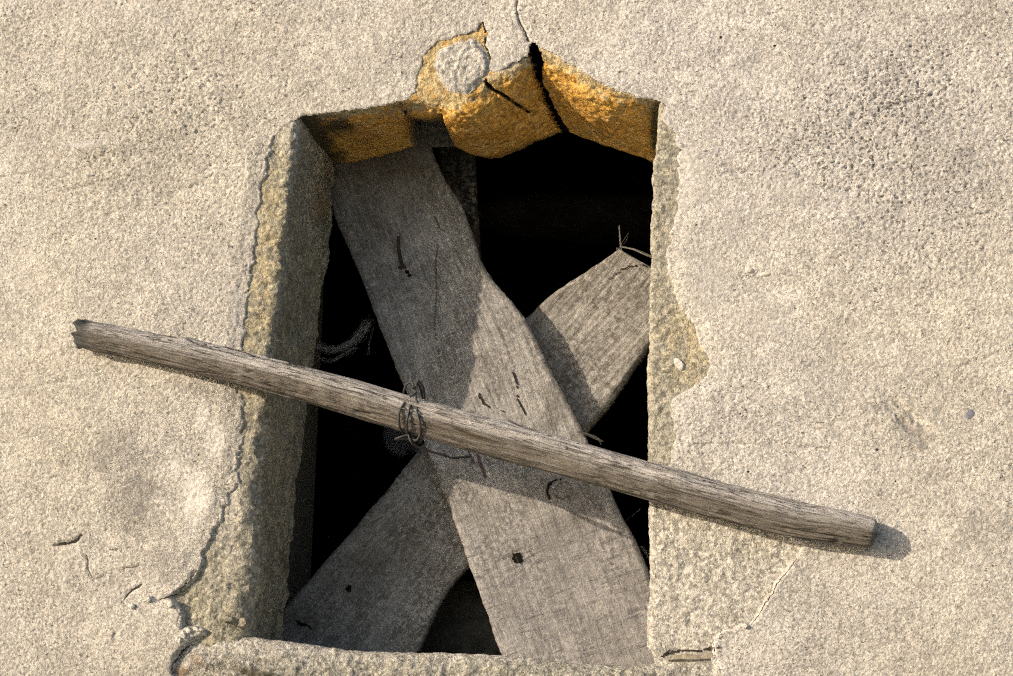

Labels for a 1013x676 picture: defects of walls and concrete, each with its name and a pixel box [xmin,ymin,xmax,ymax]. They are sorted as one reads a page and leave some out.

spalling [409,22,532,100]
crack [483,0,569,131]
peeling [242,120,296,357]
peeling [649,102,709,466]
crack [55,535,95,580]
crack [124,565,197,600]
water stain [138,399,228,562]
peeling [125,385,265,648]
crack [751,558,797,625]